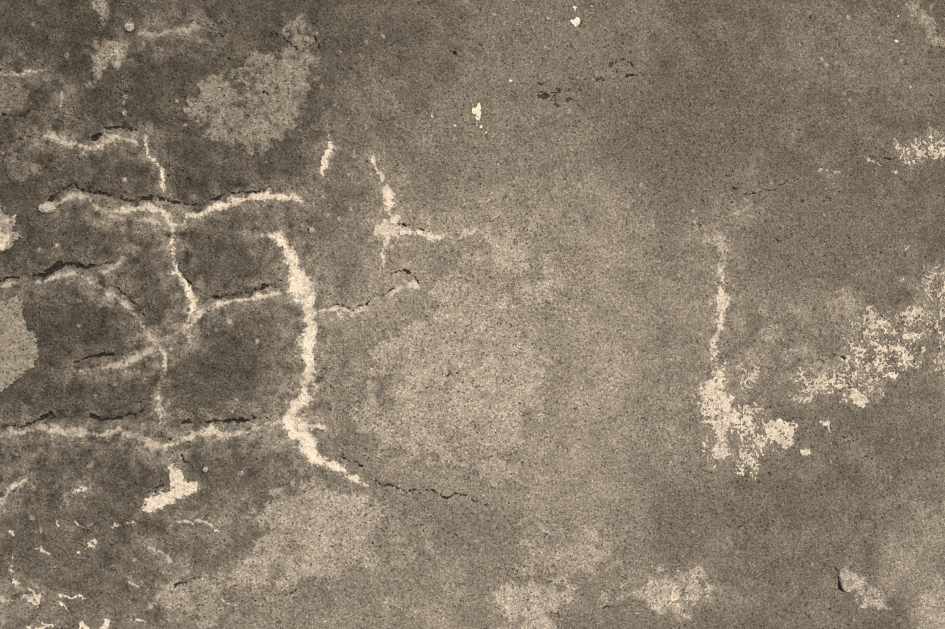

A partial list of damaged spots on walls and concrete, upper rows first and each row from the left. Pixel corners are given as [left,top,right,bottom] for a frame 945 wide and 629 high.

crack [0,68,44,78]
peeling [0,205,23,251]
peeling [0,295,39,392]
crack [0,87,487,506]
water stain [344,192,570,490]
water stain [691,209,811,479]
water stain [141,453,200,513]